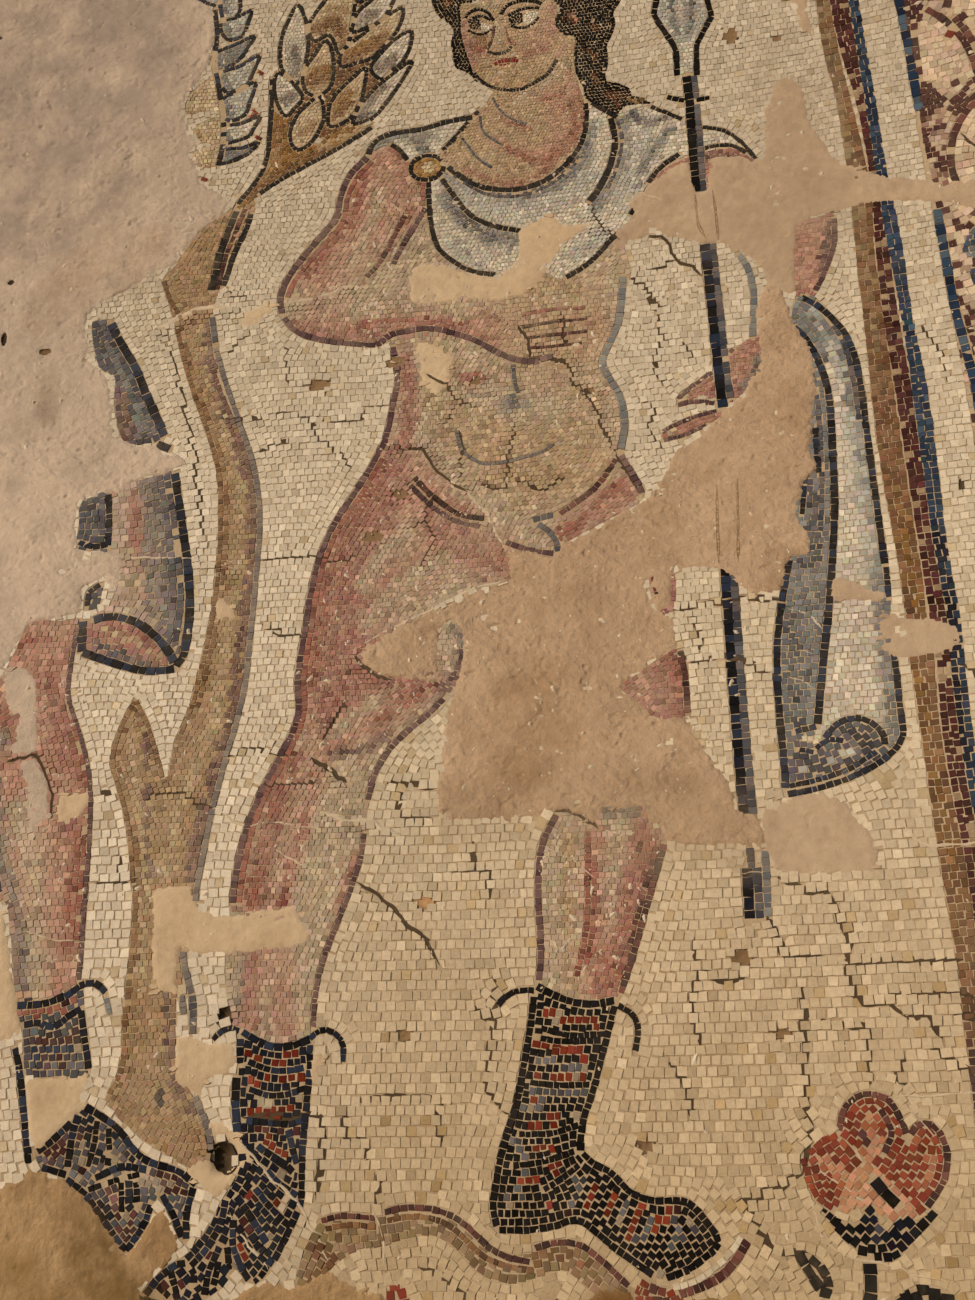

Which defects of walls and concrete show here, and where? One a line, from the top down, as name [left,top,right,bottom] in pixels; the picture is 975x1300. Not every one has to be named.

spalling [0,0,229,827]
crack [71,291,384,569]
crack [387,374,565,567]
crack [517,314,645,493]
crack [588,204,702,449]
spalling [359,75,975,877]
crack [143,701,433,870]
spalling [0,911,23,1041]
spalling [148,886,310,996]
spalling [0,1169,179,1300]
spalling [184,1120,254,1198]
crack [239,1093,444,1272]